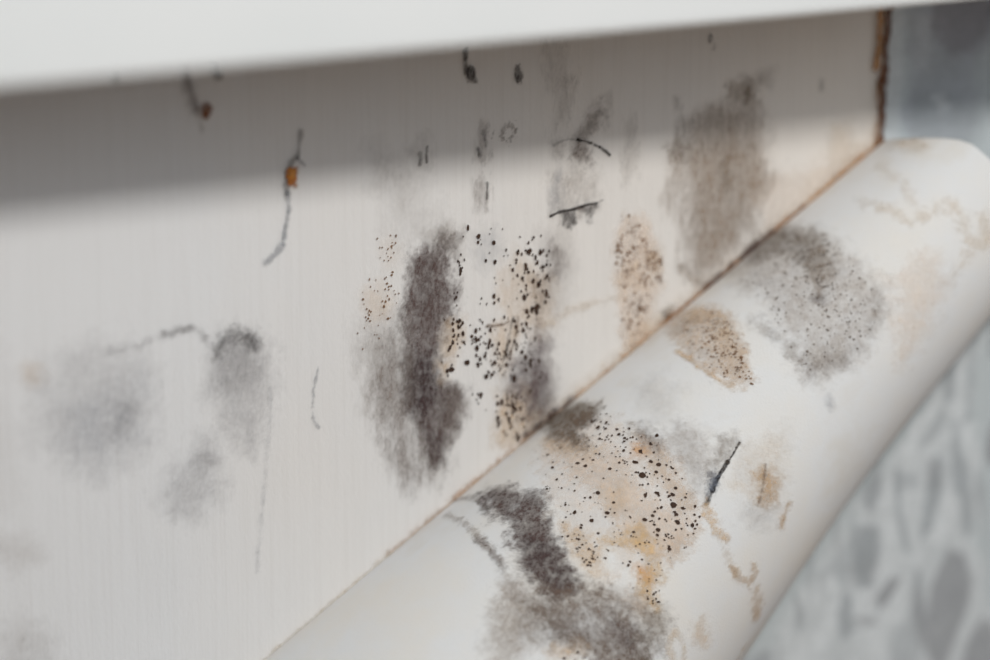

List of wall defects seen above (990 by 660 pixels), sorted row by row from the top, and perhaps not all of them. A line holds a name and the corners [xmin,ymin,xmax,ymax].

corrosion [202,104,213,119]
corrosion [285,167,298,187]
water stain [672,109,766,266]
water stain [666,309,754,385]
water stain [732,227,877,370]
water stain [357,214,712,660]